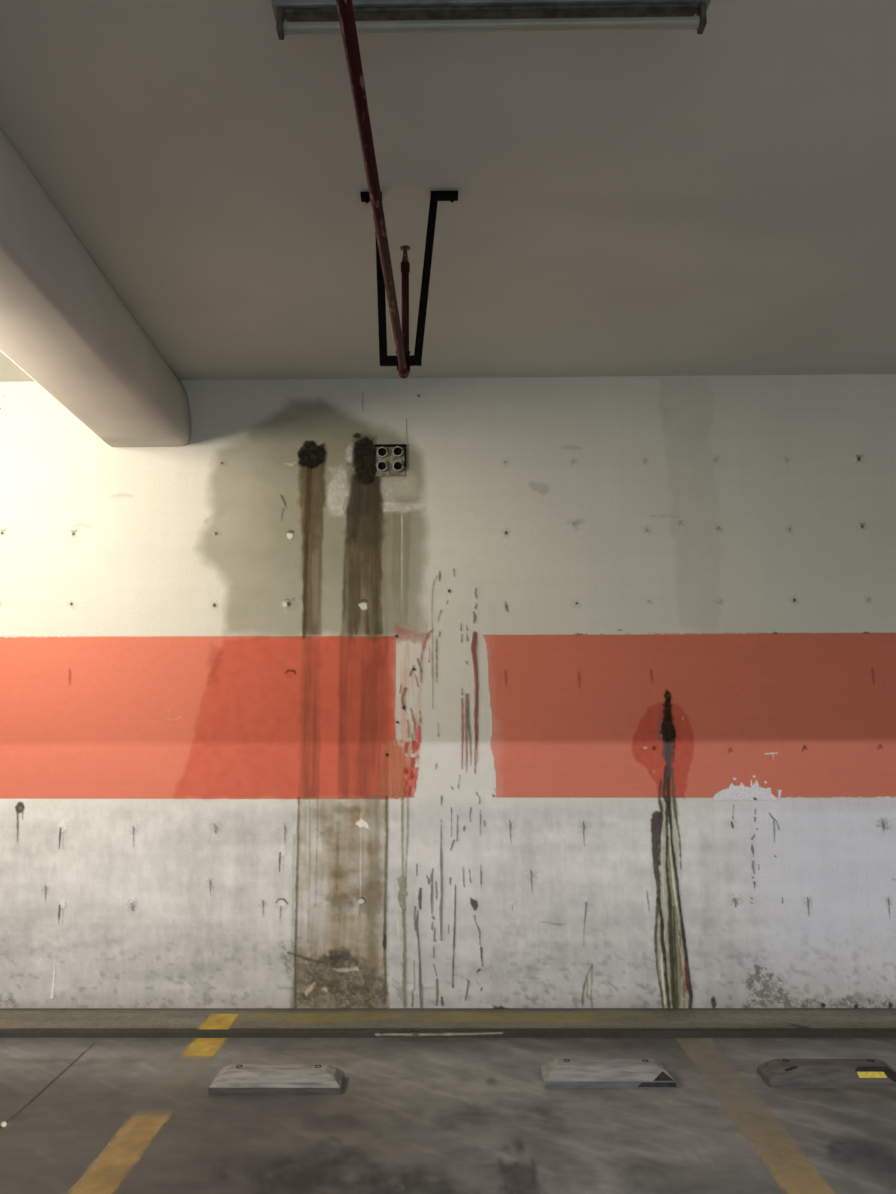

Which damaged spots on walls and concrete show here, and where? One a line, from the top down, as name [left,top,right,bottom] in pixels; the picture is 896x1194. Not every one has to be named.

damp [298,441,325,638]
damp [343,433,382,635]
rust [294,796,388,1008]
peeling [713,775,782,903]